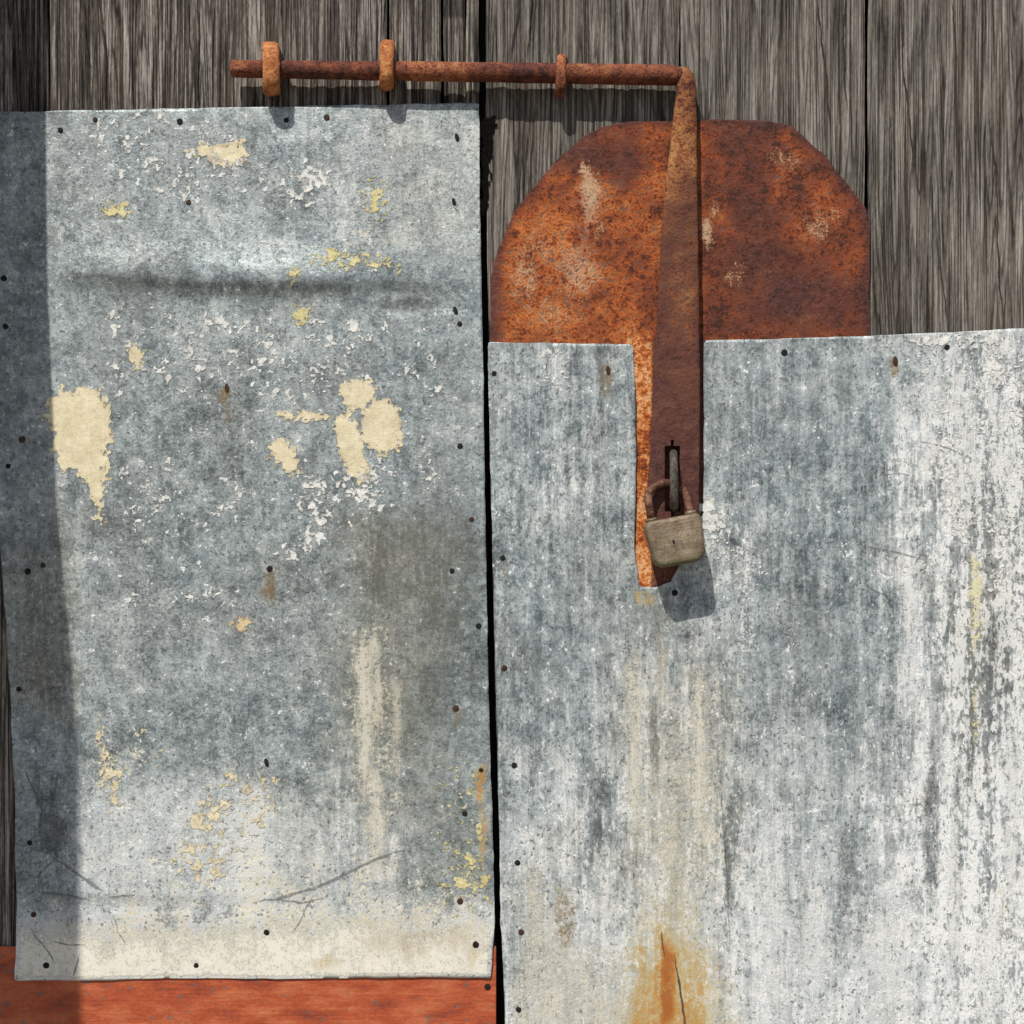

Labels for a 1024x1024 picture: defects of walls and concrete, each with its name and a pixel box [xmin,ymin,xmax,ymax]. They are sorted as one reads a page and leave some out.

peeling [98,199,132,218]
peeling [69,110,333,212]
peeling [360,176,391,233]
peeling [41,239,407,561]
peeling [398,327,443,420]
peeling [417,435,440,491]
peeling [170,560,239,606]
peeling [93,715,167,815]
peeling [166,769,281,893]
peeling [434,766,493,918]
rust [621,906,735,1024]